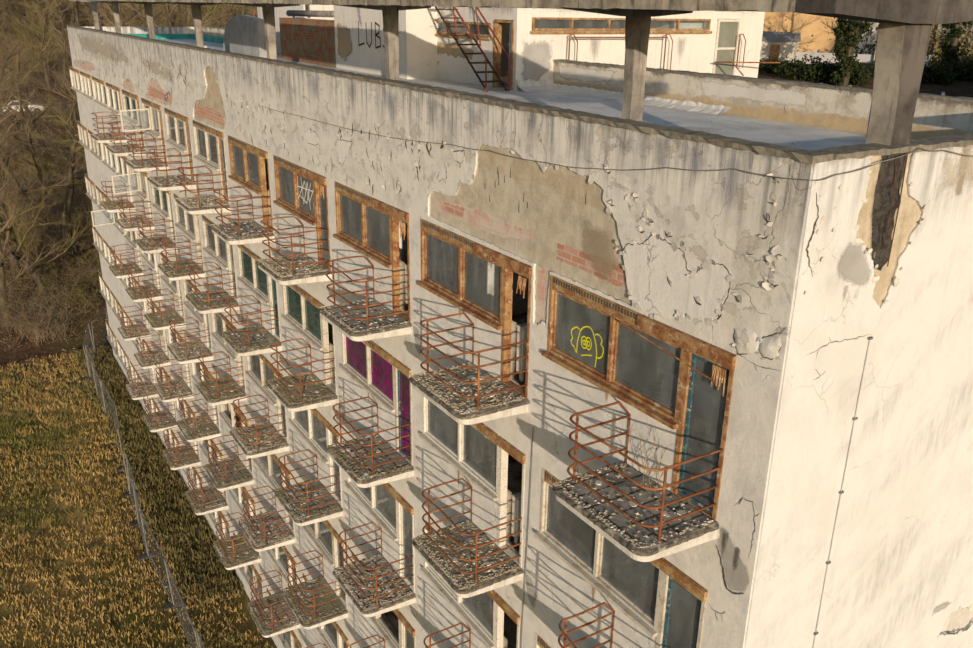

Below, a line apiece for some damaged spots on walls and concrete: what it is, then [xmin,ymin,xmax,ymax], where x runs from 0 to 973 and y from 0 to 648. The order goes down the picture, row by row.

spalling [73,36,187,108]
spalling [192,66,403,195]
spalling [405,135,743,327]
peeling [758,173,782,291]
peeling [806,193,835,277]
peeling [855,224,873,254]
spalling [871,155,908,284]
spalling [937,604,973,638]